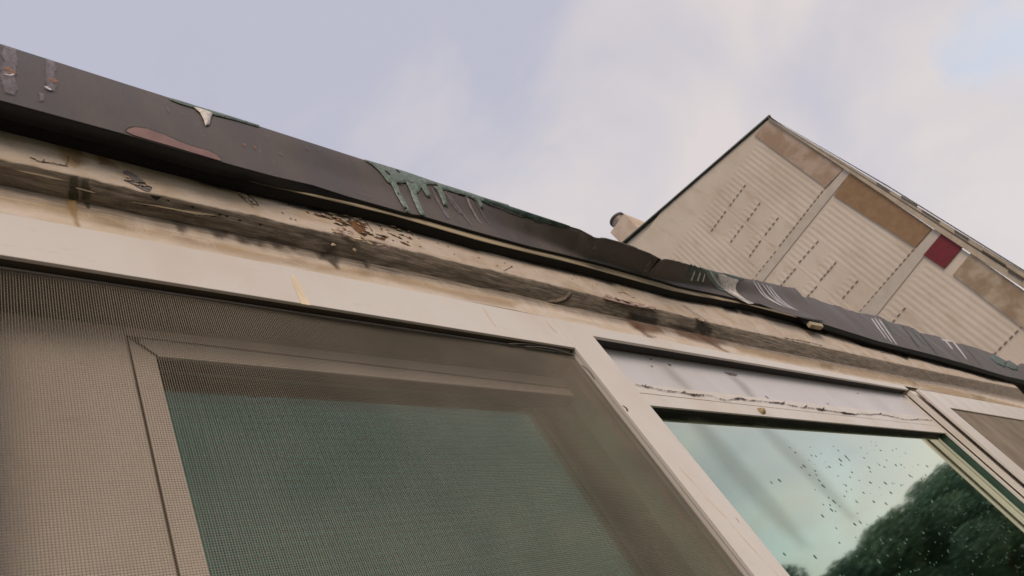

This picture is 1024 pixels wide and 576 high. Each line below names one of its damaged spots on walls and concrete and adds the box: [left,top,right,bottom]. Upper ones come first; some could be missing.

damp [68,177,90,200]
peeling [122,171,241,221]
damp [196,180,326,213]
spalling [306,210,421,251]
damp [316,248,337,267]
damp [514,258,613,285]
damp [636,288,826,335]
damp [850,340,1010,383]